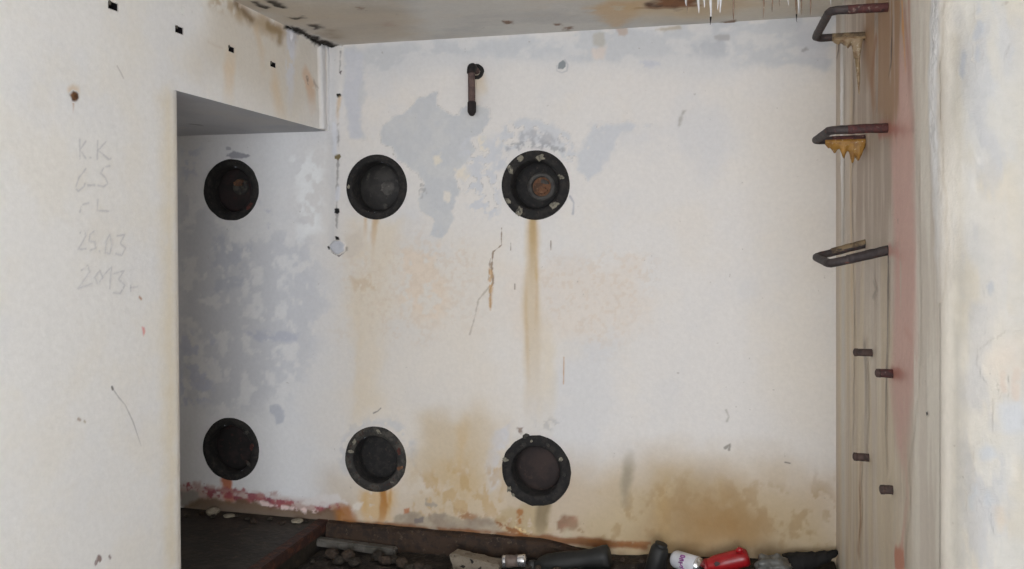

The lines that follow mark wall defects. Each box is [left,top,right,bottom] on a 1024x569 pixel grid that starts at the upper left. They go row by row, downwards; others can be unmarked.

rust [577,0,783,29]
rust [65,81,81,114]
peeling [248,0,836,238]
peeling [177,141,368,426]
crack [468,227,503,336]
rust [335,209,836,565]
peeling [180,479,368,521]
peeling [383,497,505,530]
water stain [616,446,639,511]